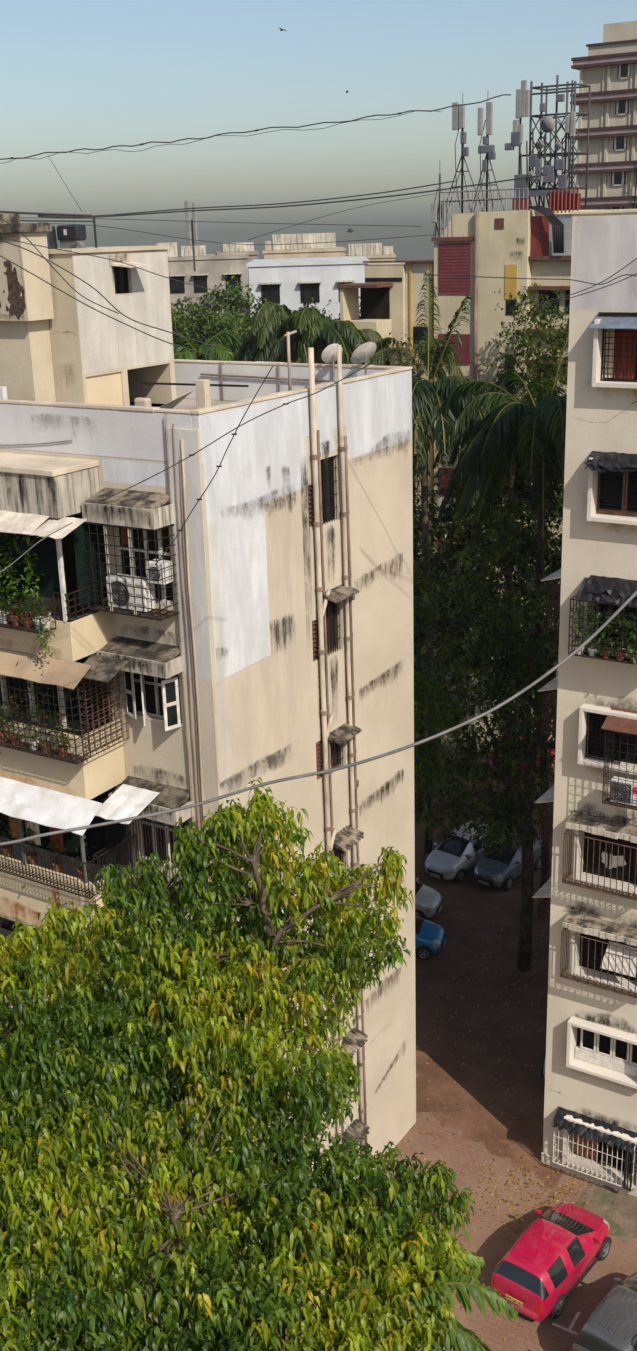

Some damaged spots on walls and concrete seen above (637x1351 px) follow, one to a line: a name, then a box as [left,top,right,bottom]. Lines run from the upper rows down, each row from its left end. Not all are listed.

flaking render [0,261,26,320]
water stain [230,751,285,783]